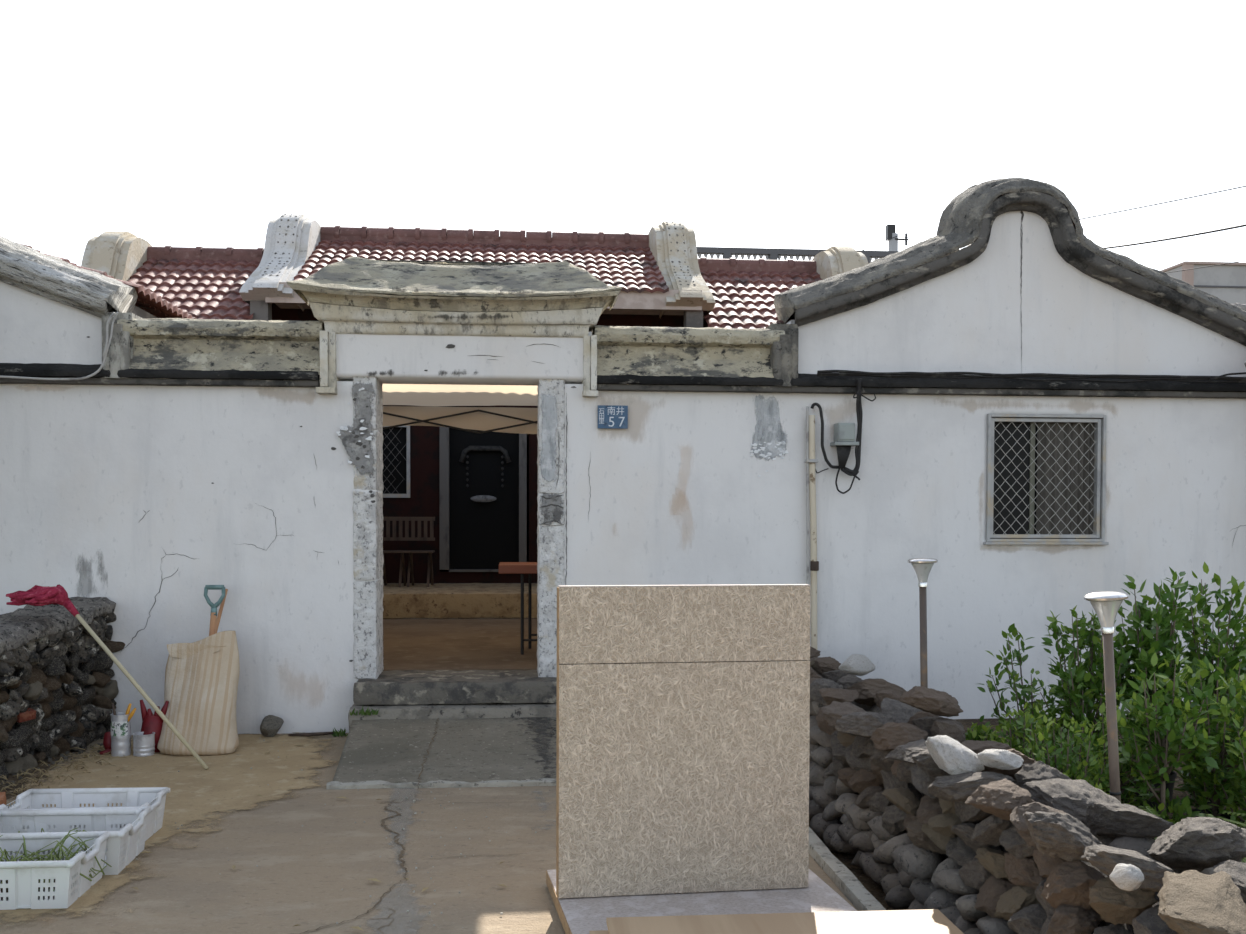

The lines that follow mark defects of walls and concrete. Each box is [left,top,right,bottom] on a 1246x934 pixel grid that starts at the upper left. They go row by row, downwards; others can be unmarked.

spalling [331,383,376,503]
peeling [749,395,788,477]
crack [239,506,339,563]
crack [122,551,193,650]